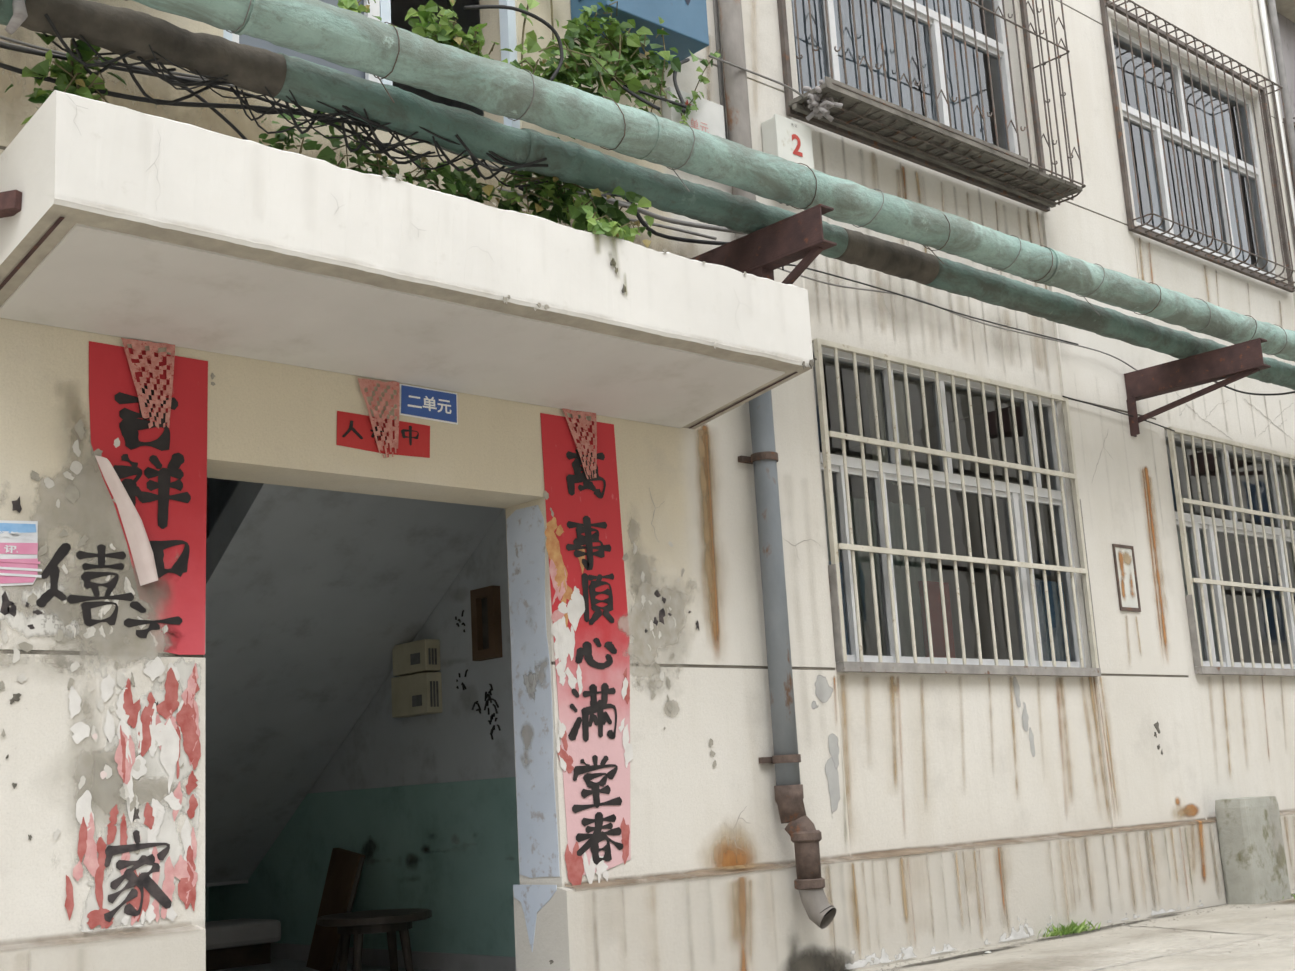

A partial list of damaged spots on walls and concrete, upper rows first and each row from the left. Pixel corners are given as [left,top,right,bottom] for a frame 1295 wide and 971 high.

peeling [0,417,171,704]
peeling [618,520,699,730]
corrosion [698,425,719,643]
corrosion [1143,467,1167,646]
corrosion [1089,677,1116,803]
corrosion [714,835,748,971]
corrosion [1176,799,1206,878]